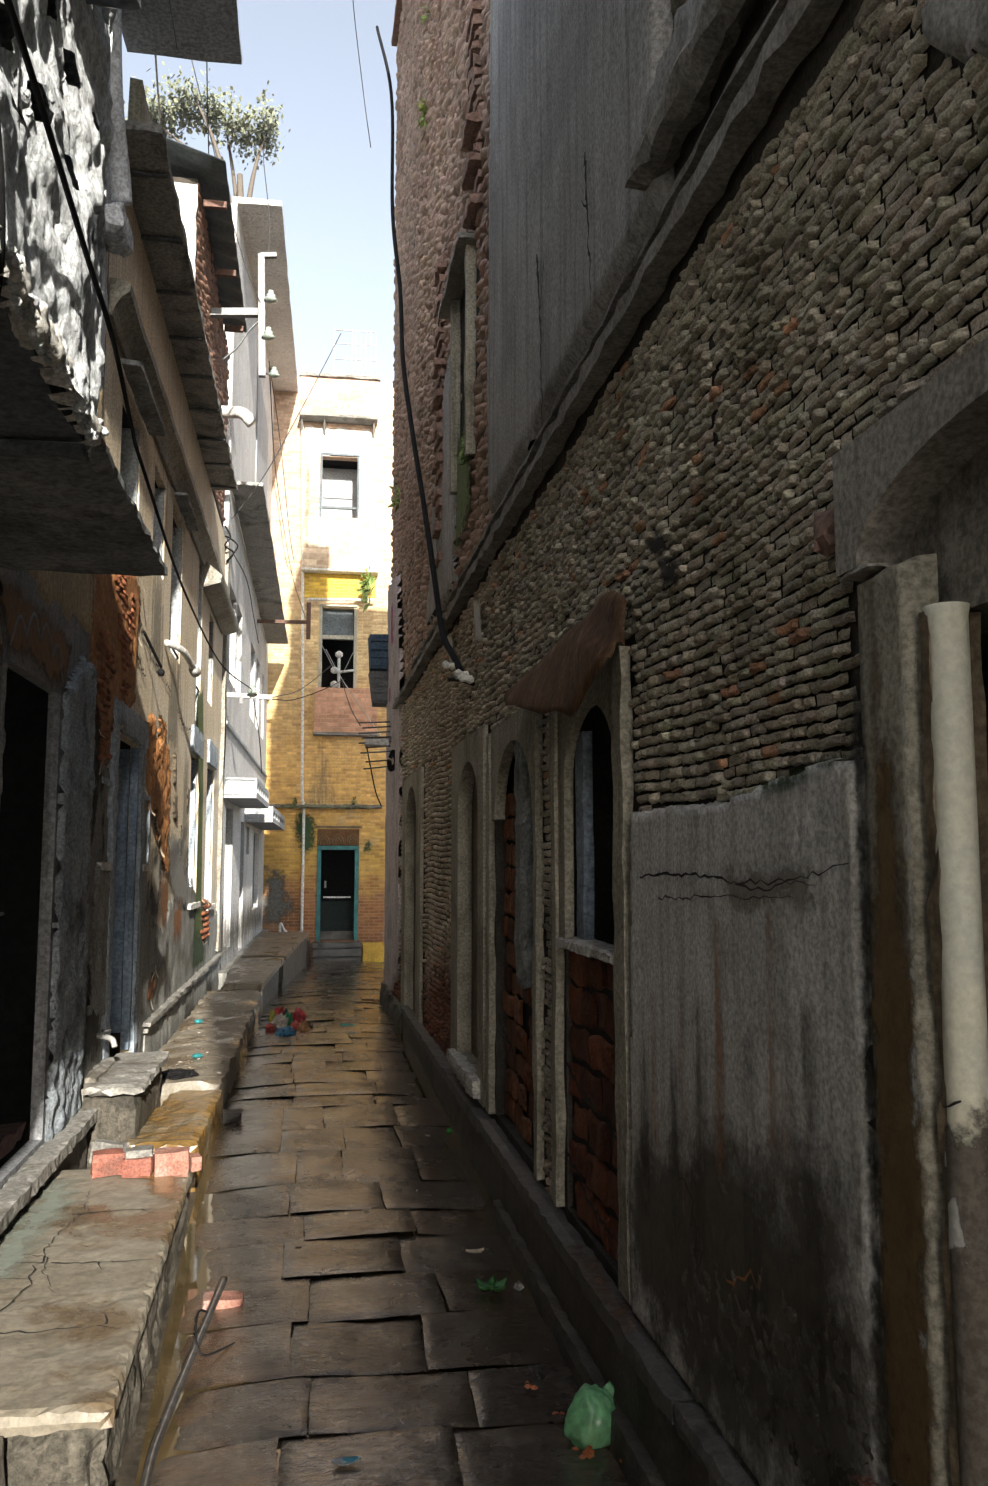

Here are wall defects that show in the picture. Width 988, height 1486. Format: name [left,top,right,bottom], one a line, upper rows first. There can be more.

peeling [89,574,212,945]
crack [0,1190,172,1334]
damp [628,744,938,1486]